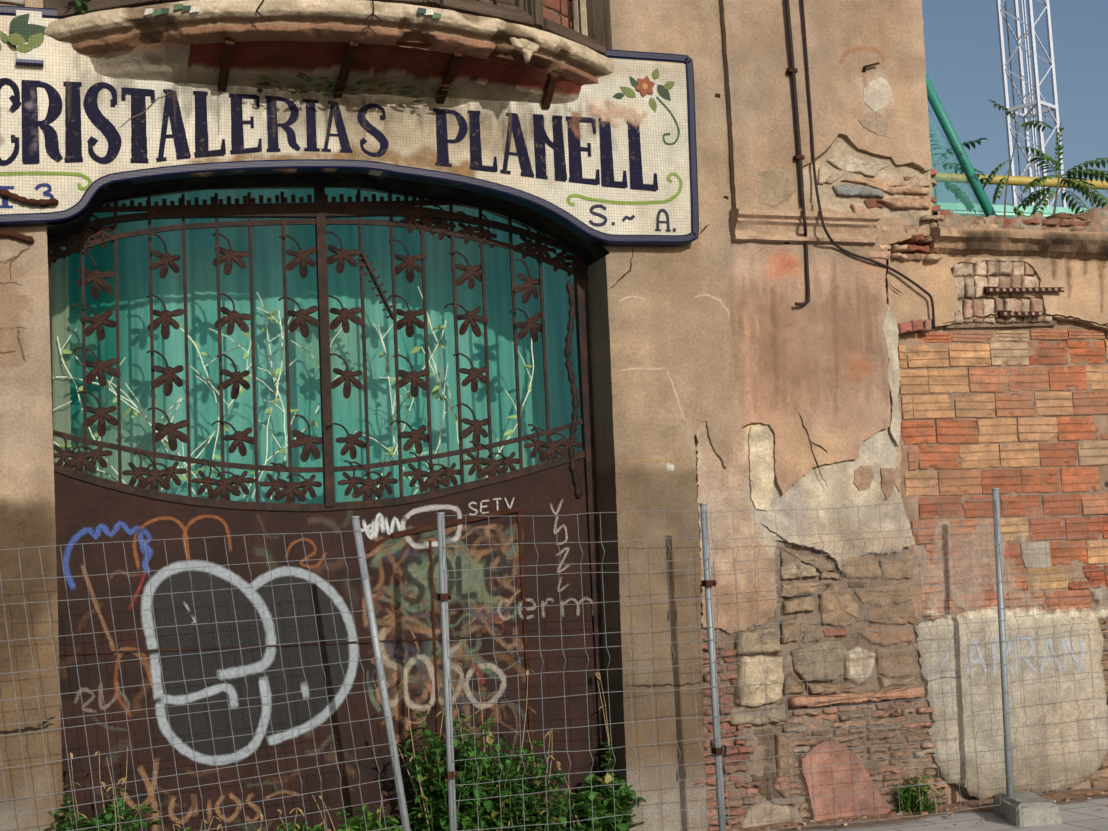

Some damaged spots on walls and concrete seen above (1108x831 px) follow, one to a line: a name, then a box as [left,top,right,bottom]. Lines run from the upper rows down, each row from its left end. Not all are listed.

spalling [798,134,932,226]
damp [966,232,995,253]
damp [1029,234,1072,254]
crack [0,247,29,285]
crack [0,327,25,360]
crack [799,414,827,486]
spalling [693,421,950,831]
crack [0,717,54,734]